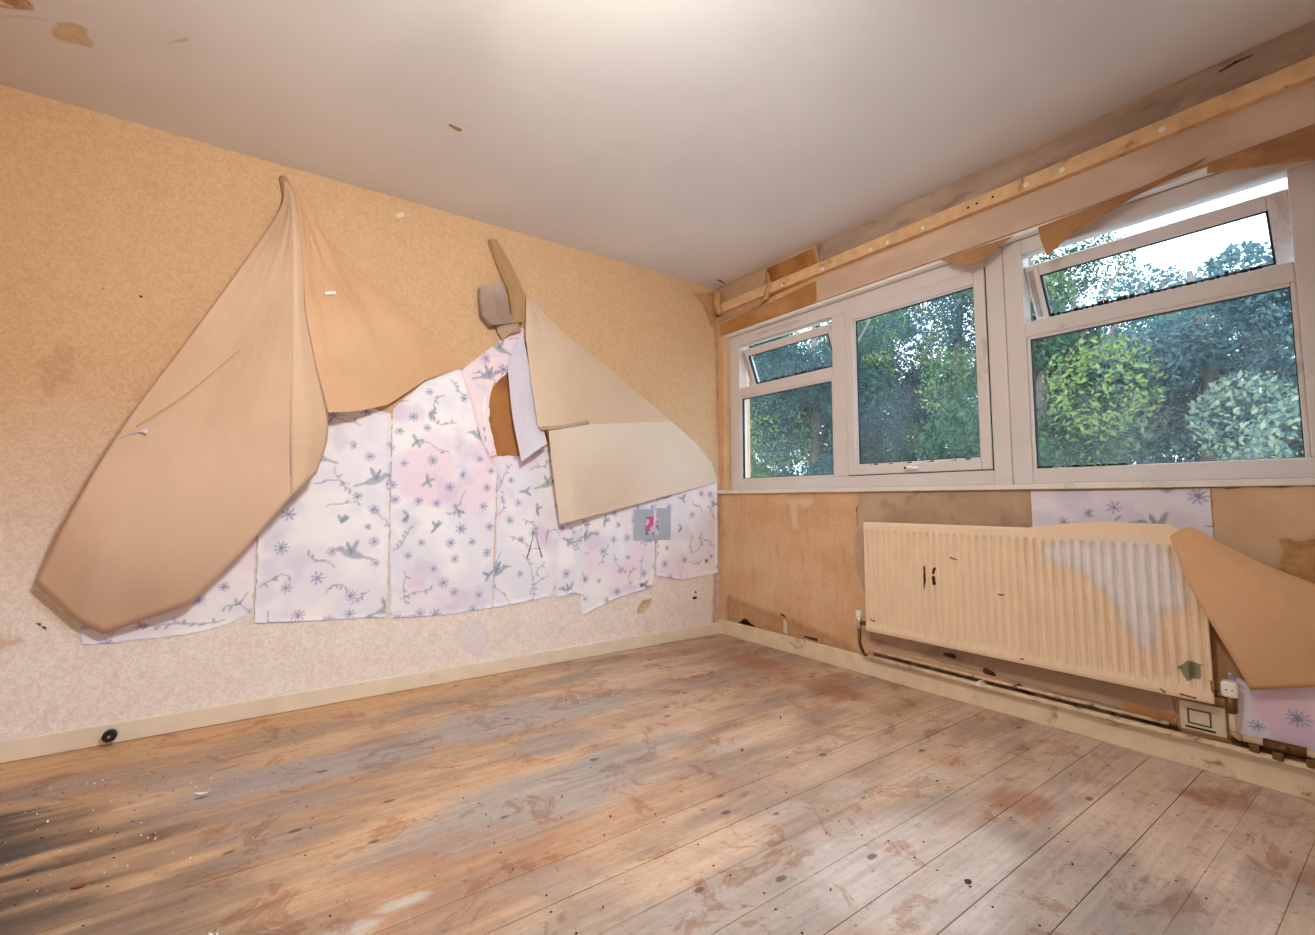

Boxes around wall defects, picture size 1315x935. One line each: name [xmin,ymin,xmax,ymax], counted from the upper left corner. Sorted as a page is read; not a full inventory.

peeling [488,239,525,324]
flaking render [489,373,520,457]
peeling [637,599,652,613]
peeling [1170,526,1315,690]